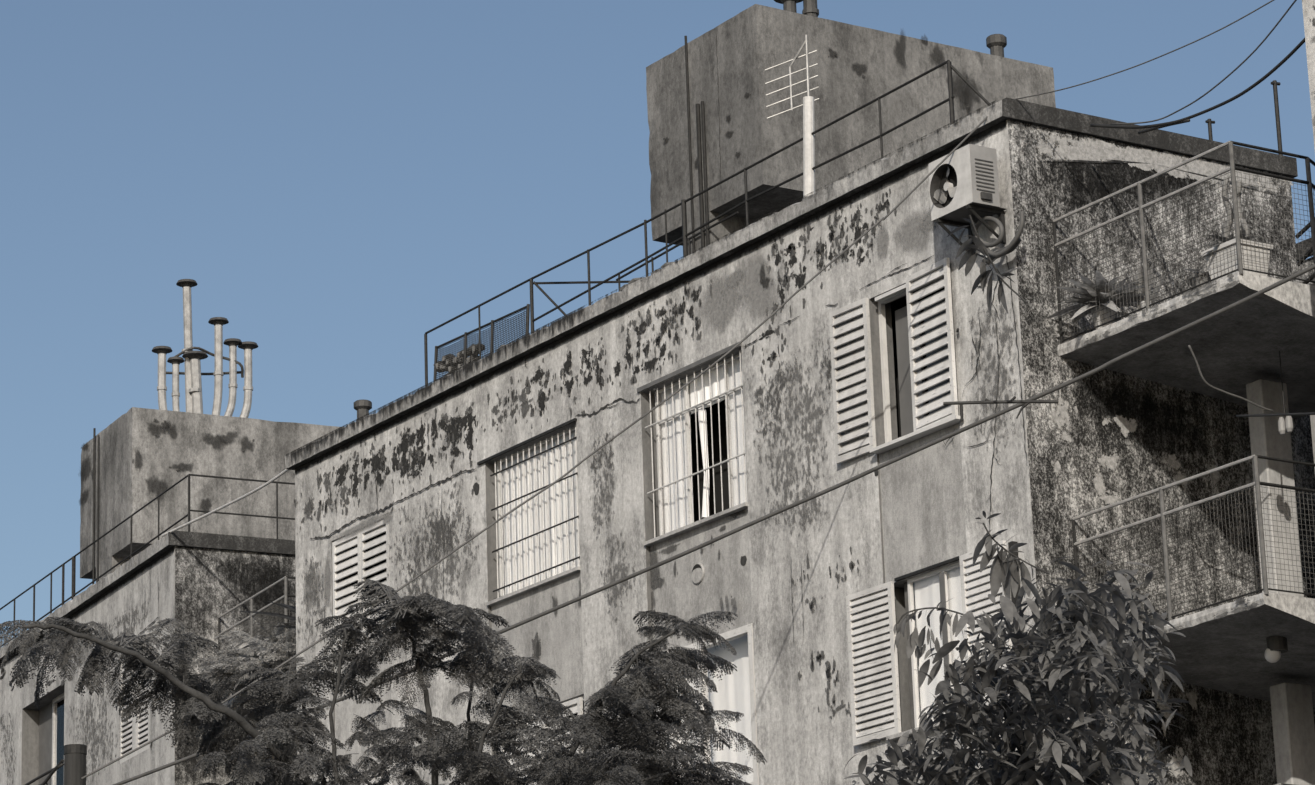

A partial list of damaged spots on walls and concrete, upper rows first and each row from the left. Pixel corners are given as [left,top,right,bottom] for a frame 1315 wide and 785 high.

damp [1038,145,1201,209]
peeling [745,189,897,375]
peeling [293,273,712,534]
damp [747,341,836,536]
damp [1073,375,1206,461]
damp [590,432,679,621]
damp [700,510,744,559]
damp [65,600,149,671]
damp [69,686,118,783]
damp [1121,688,1199,785]